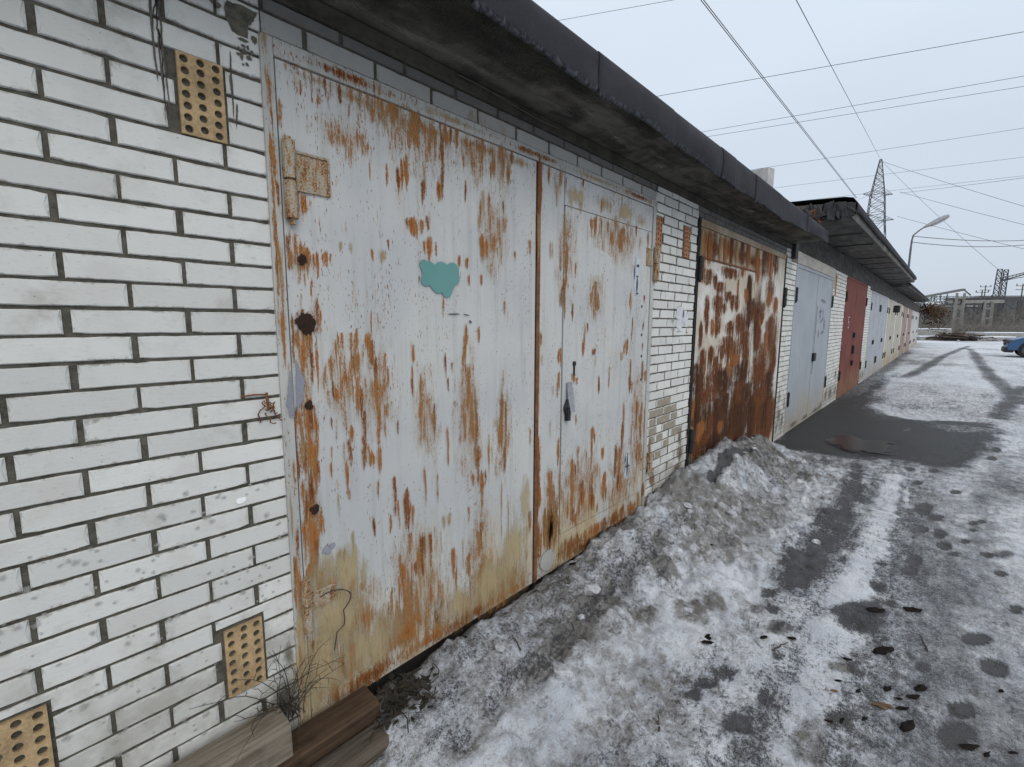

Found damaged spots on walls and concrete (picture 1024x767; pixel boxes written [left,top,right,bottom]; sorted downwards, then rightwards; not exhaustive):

spalling [210,0,257,66]
corrosion [264,56,652,718]
corrosion [686,226,780,464]